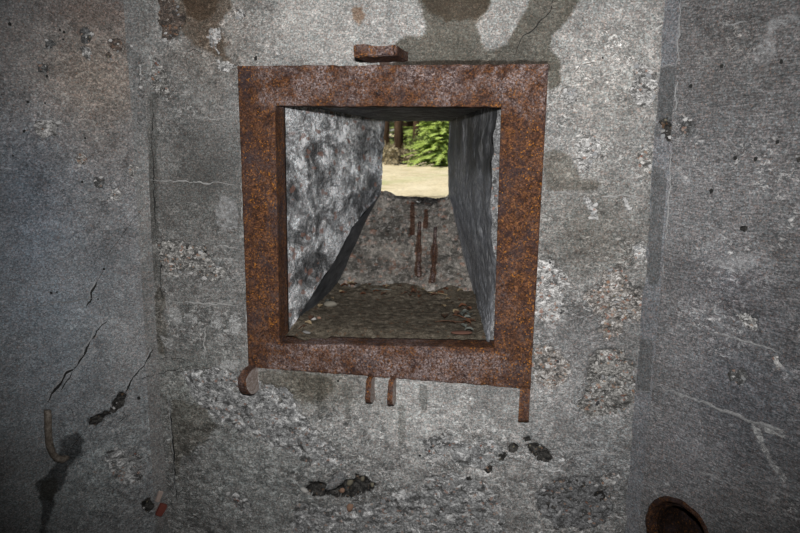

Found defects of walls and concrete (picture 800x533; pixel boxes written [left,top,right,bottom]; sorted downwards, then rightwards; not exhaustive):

crack [46,320,107,449]
hole [88,392,127,426]
crack [123,350,197,393]
spalling [181,365,553,533]